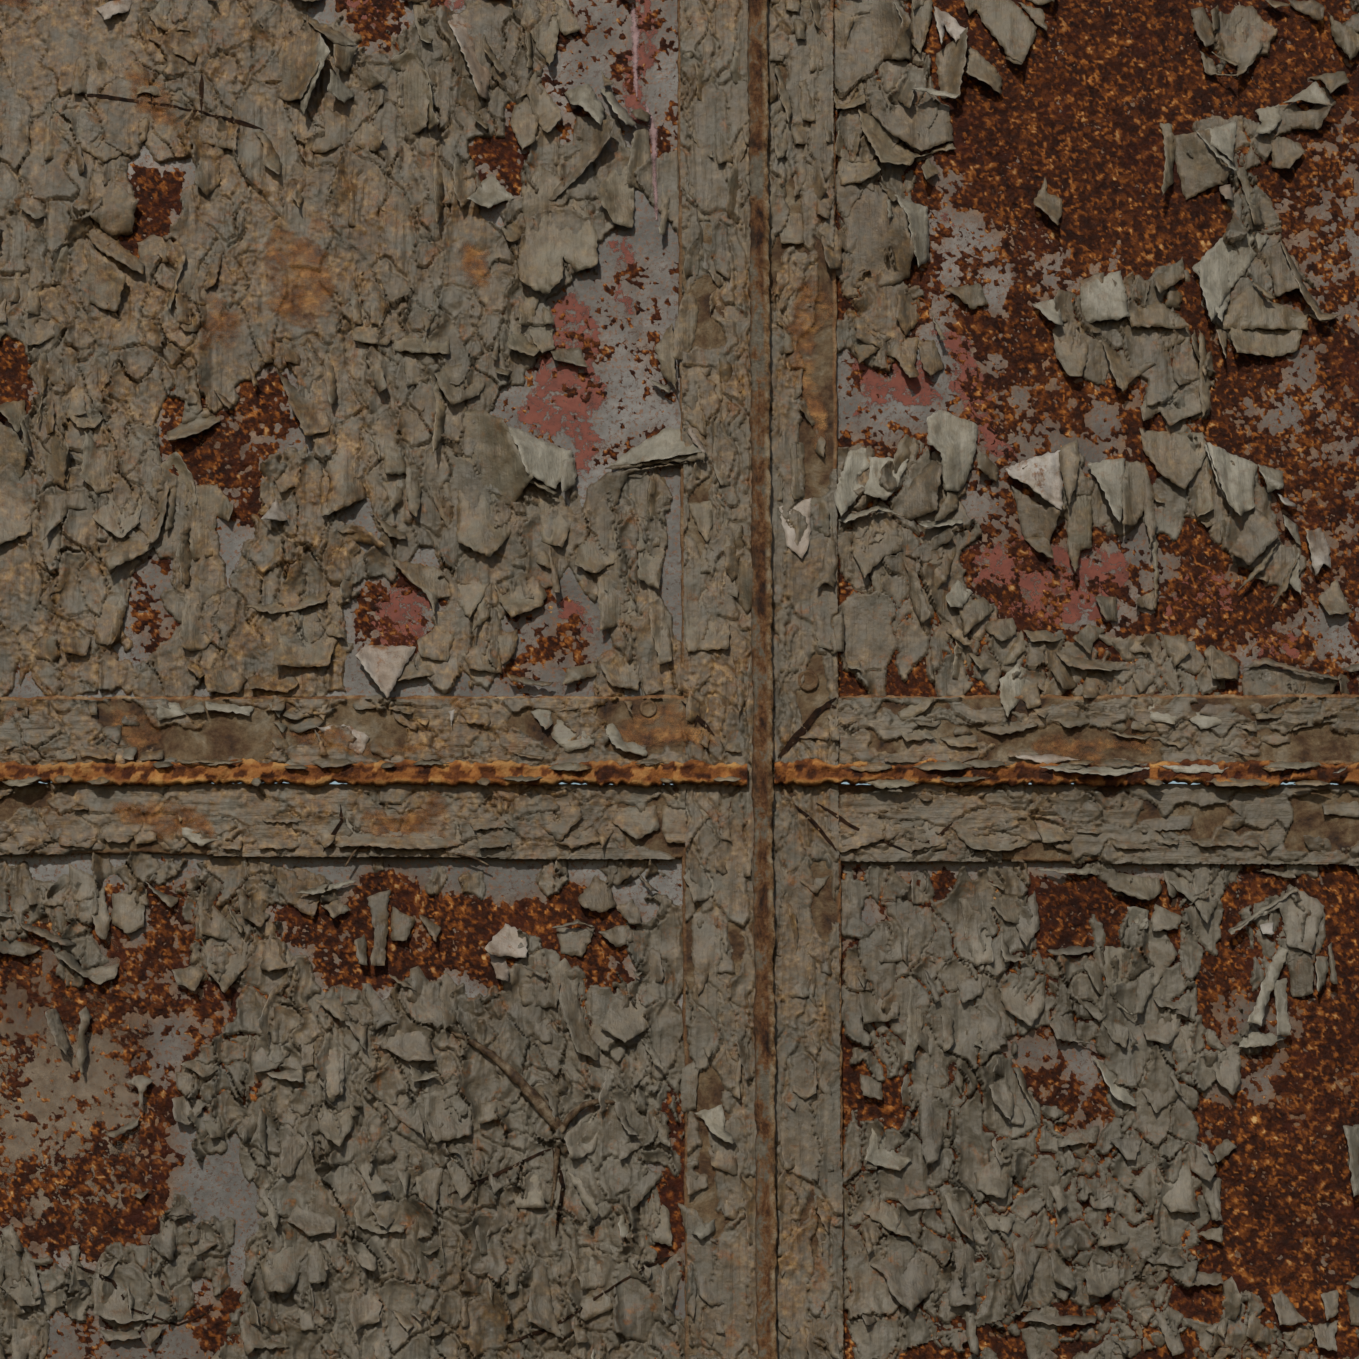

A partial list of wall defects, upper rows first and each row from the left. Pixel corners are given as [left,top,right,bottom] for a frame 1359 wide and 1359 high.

rust [499,246,679,466]
rust [788,0,1359,697]
rust [116,802,214,837]
rust [280,729,370,754]
peeling [0,0,758,1359]
peeling [767,0,1359,1359]
rust [0,863,637,1286]
rust [645,1084,685,1281]
rust [841,862,1359,1359]
rust [44,1310,123,1359]
rust [138,1257,248,1359]